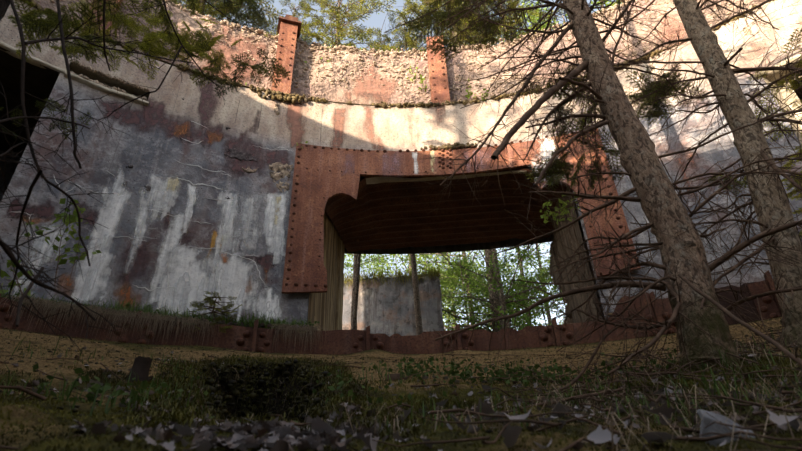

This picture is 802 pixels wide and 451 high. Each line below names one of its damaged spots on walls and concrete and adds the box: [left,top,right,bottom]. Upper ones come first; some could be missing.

corrosion [287,102,305,147]
corrosion [330,109,346,148]
corrosion [365,106,399,174]
spalling [269,162,293,192]
leakage [71,172,286,321]